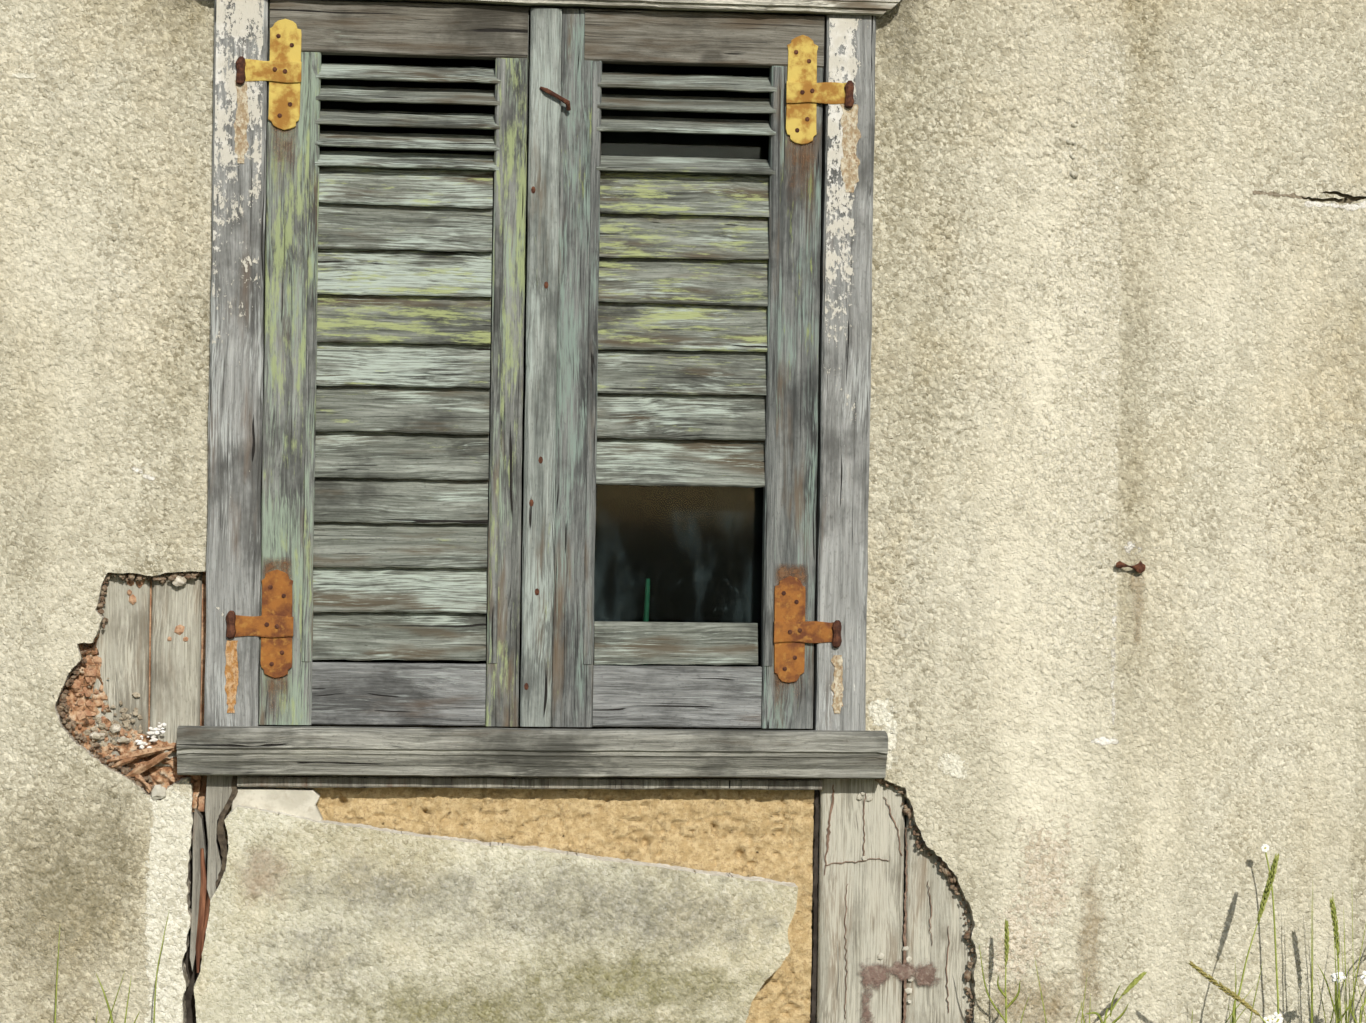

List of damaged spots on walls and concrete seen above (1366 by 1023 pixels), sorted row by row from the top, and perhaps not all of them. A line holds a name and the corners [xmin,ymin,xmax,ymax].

peeling [212,0,264,364]
peeling [825,18,868,347]
crack [1253,190,1366,211]
flaking render [55,571,233,1023]
crack [182,775,238,1023]
flaking render [222,697,1085,1023]